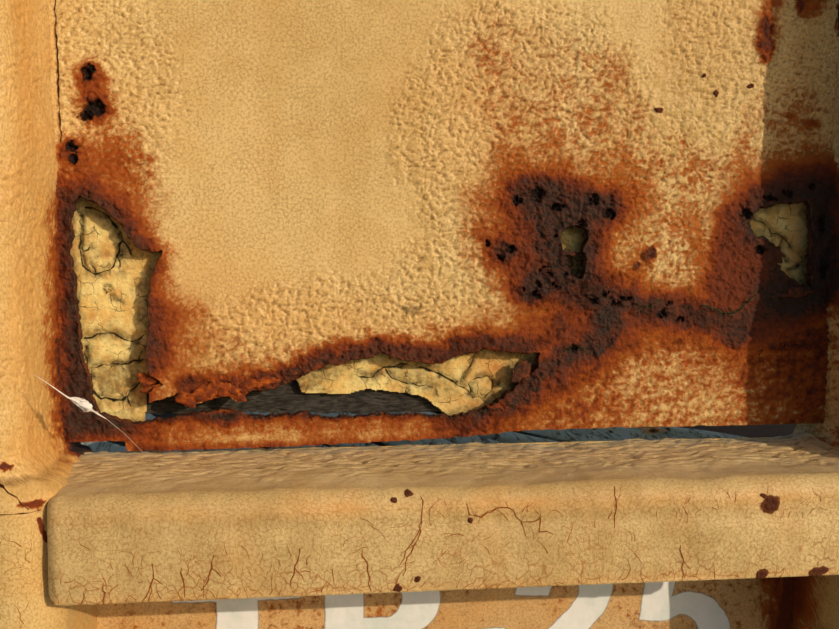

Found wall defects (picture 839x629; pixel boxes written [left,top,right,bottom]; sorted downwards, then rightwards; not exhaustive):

corrosion [754,0,783,64]
corrosion [795,0,839,30]
corrosion [43,20,839,463]
peeling [175,358,325,408]
crack [0,483,41,515]
corrosion [17,499,47,543]
crack [50,486,738,605]
corrosion [729,576,823,629]